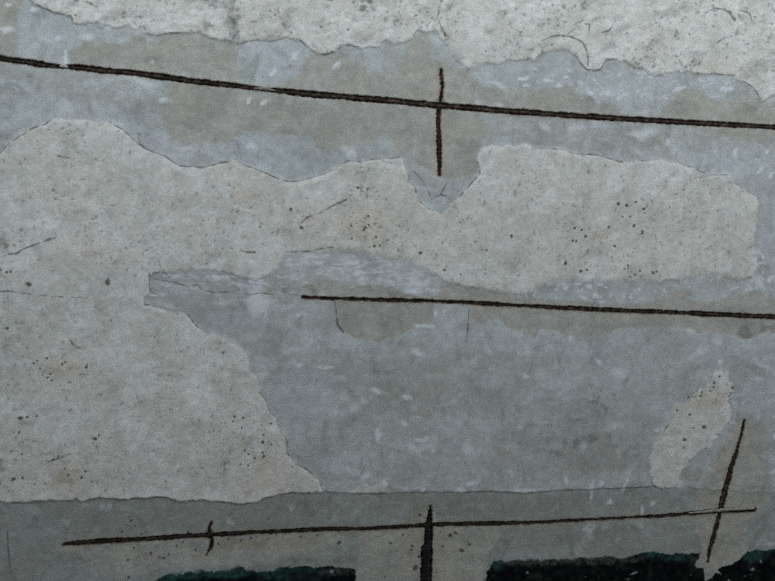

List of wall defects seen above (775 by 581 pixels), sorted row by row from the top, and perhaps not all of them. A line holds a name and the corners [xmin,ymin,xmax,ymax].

spalling [0,0,775,215]
flaking render [0,127,775,581]